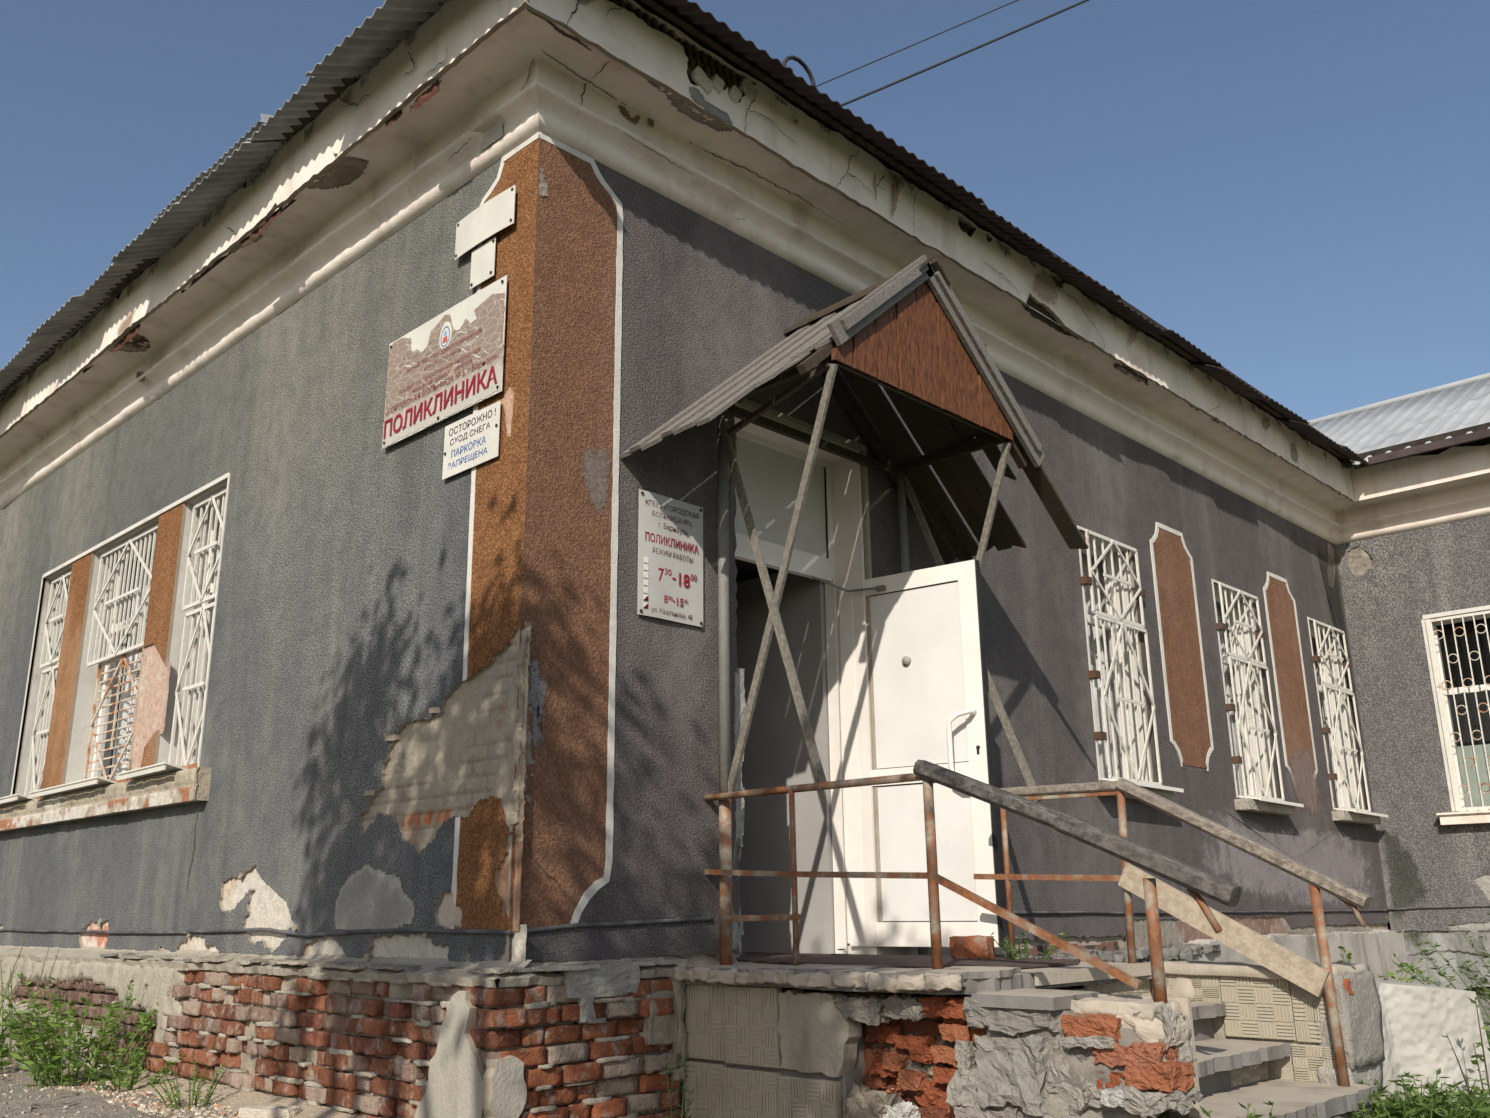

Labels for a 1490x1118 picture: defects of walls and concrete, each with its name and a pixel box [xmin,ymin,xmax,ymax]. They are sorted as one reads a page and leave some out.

flaking render [307,153,368,190]
crack [521,0,918,229]
flaking render [81,621,966,993]
leakage [1203,748,1375,907]
flaking render [12,977,157,1070]